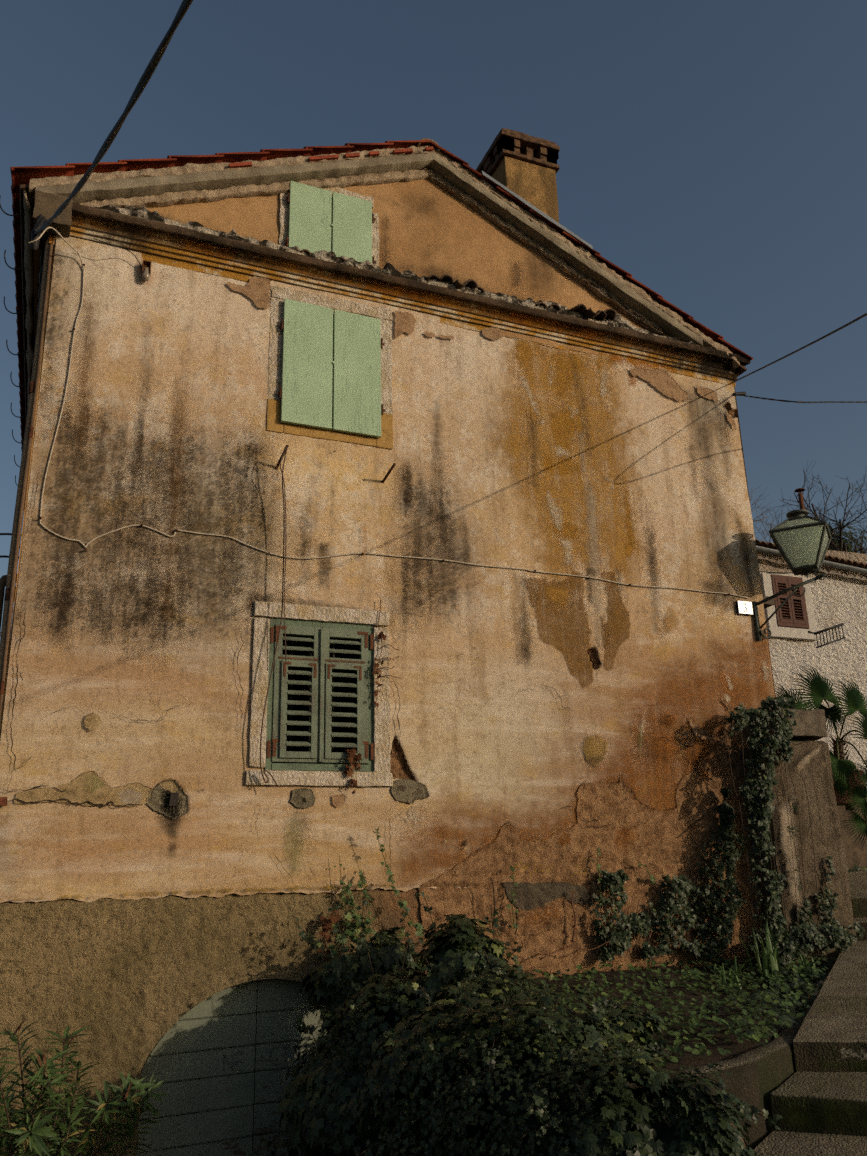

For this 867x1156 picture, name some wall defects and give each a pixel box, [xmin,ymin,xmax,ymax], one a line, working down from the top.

flaking render [696,385,738,429]
leakage [16,387,270,652]
leakage [402,464,473,616]
spalling [0,771,189,807]
spalling [390,734,429,804]
spalling [419,716,770,975]